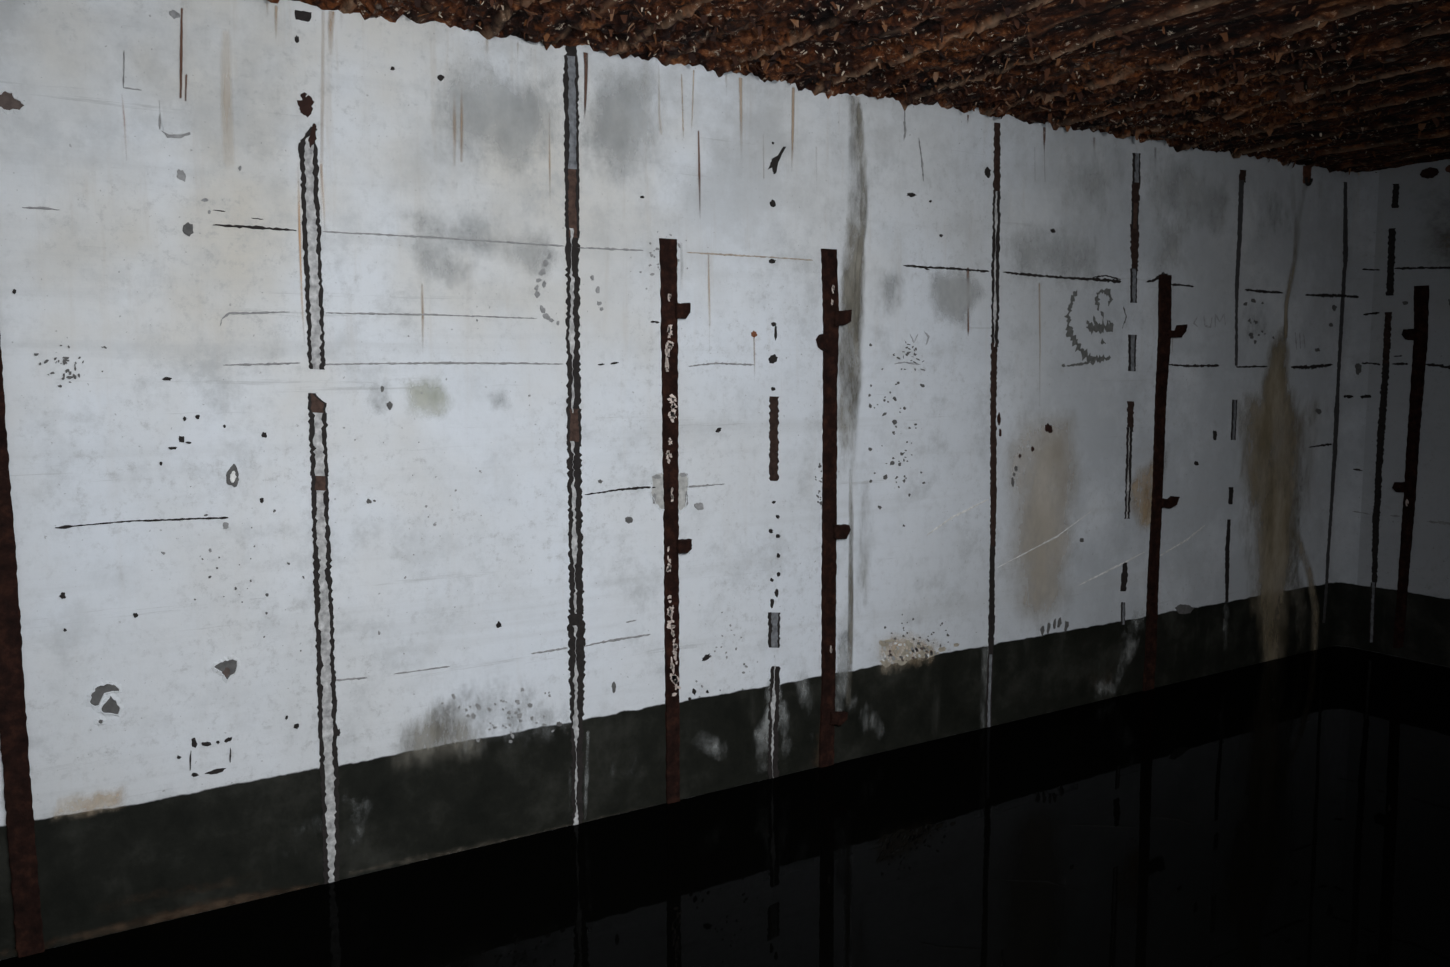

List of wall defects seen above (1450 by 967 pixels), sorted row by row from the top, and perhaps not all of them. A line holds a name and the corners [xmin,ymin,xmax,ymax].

water stain [0,825,18,960]
corrosion [0,334,45,958]
corrosion [659,238,692,804]
water stain [34,251,1450,949]
corrosion [816,249,852,768]
water stain [839,96,867,430]
corrosion [1142,274,1188,691]
corrosion [1392,285,1429,648]